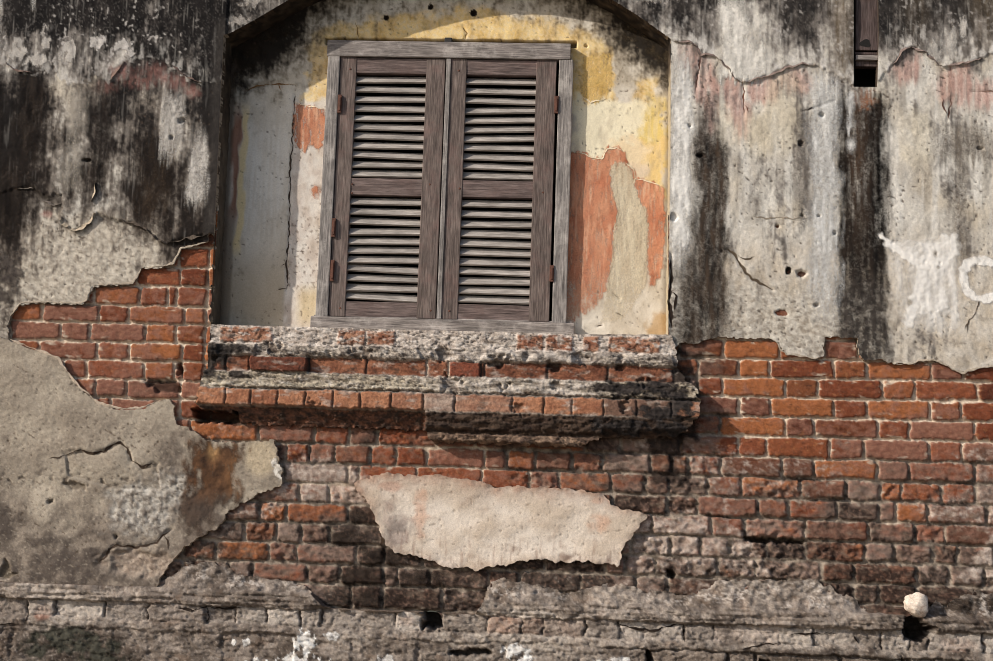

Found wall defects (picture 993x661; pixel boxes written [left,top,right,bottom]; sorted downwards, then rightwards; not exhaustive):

damp [90,35,135,57]
damp [719,0,767,86]
peeling [292,102,325,153]
damp [185,135,209,202]
peeling [566,145,666,321]
damp [590,27,730,486]
damp [796,76,890,361]
flaking render [6,219,993,618]
crack [49,441,152,469]
peeling [0,558,18,579]
damp [244,628,339,661]
damp [500,642,532,661]